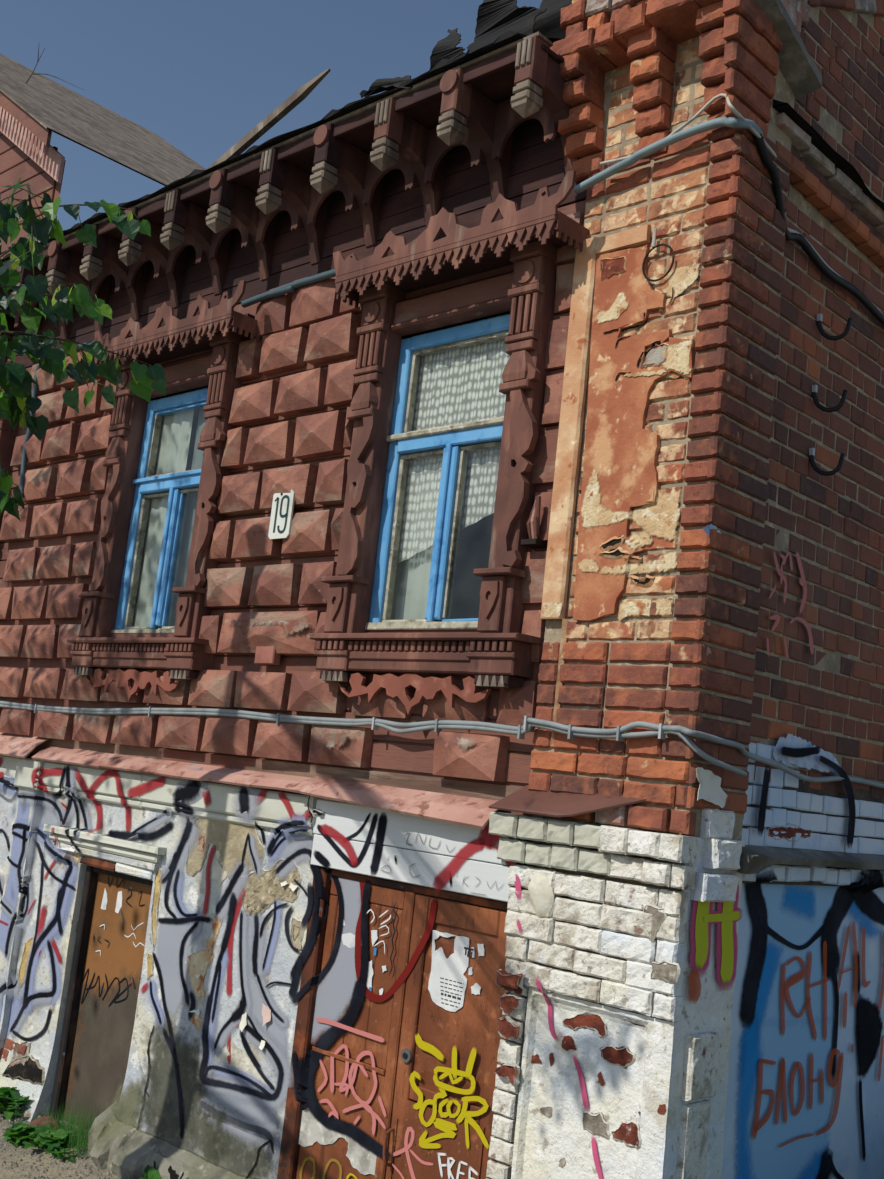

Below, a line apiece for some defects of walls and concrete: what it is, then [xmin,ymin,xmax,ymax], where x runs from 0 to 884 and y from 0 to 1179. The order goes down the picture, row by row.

peeling [646,265,699,297]
peeling [619,340,693,379]
peeling [578,469,680,620]
peeling [186,817,302,917]
spalling [291,917,304,950]
peeling [185,913,222,1029]
spalling [496,969,527,1040]
spalling [2,1041,45,1086]
spalling [495,1010,636,1086]
spalling [582,1111,641,1150]